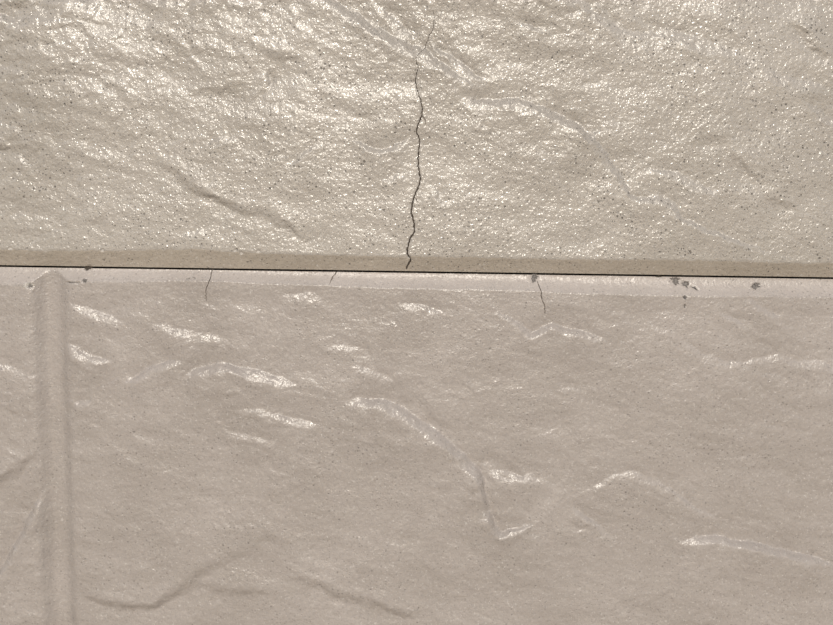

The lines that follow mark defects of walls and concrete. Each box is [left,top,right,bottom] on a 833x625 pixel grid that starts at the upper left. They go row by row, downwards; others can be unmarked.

crack [406,12,434,269]